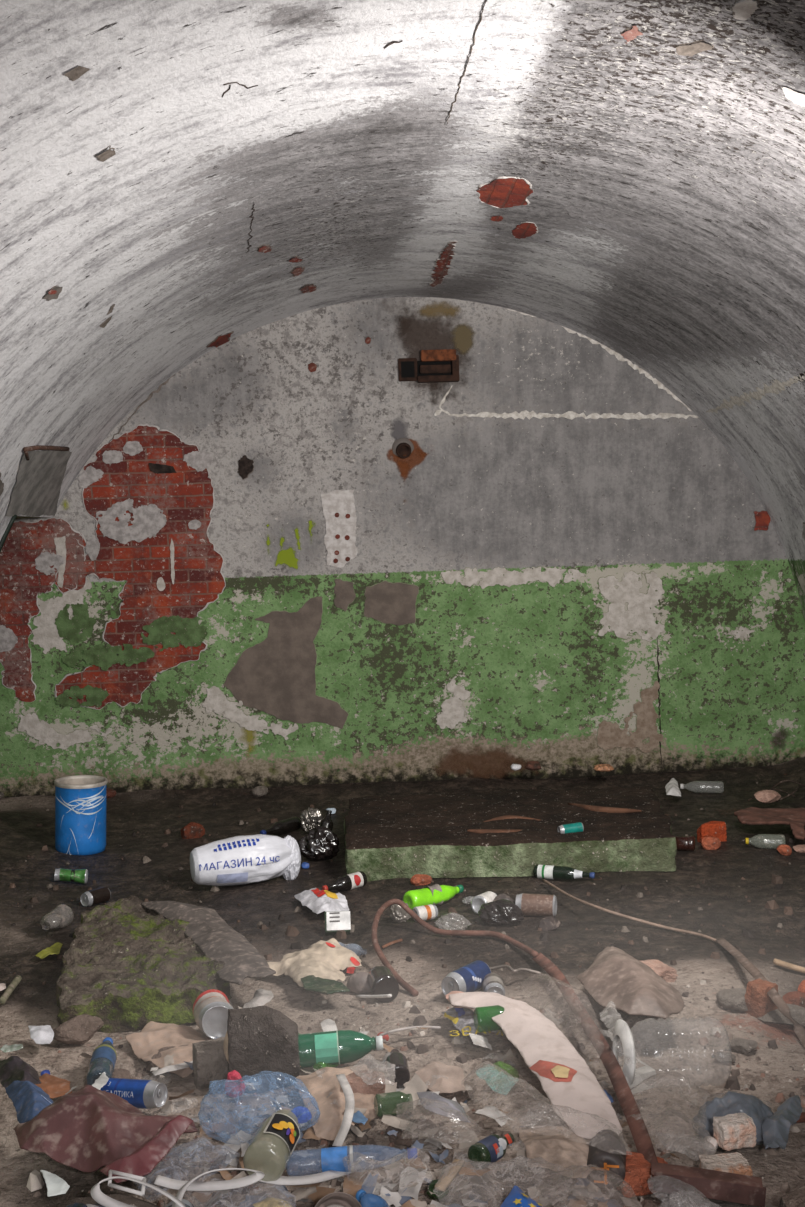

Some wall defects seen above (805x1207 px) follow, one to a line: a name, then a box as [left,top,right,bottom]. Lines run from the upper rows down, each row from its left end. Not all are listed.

crack [446,0,487,126]
flaking render [476,176,538,239]
damp [399,302,473,365]
corrosion [387,439,427,479]
flaking render [0,424,226,750]
flaking render [202,579,419,740]